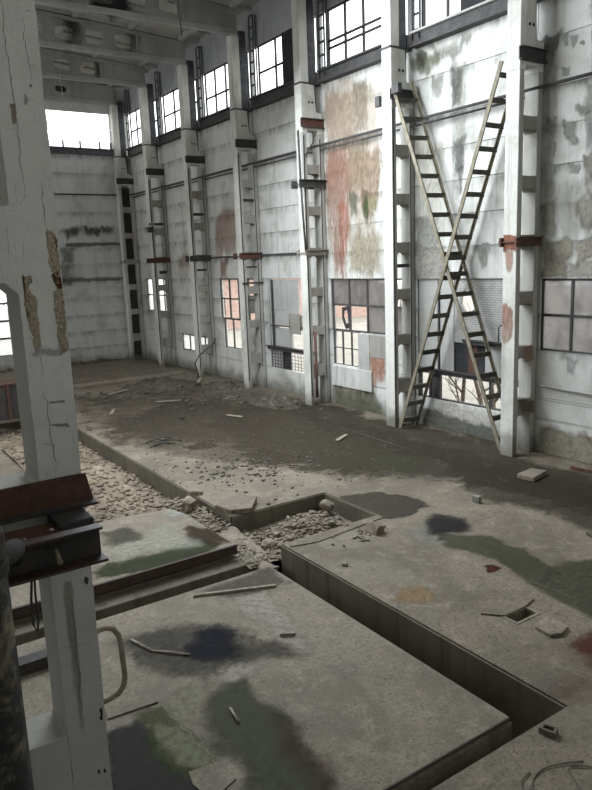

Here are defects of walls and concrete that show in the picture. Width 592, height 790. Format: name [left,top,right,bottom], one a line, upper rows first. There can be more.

damp [412,50,442,96]
crack [0,2,46,265]
damp [451,65,465,168]
damp [575,85,592,230]
corrosion [351,232,379,273]
damp [415,218,449,280]
corrosion [503,235,516,271]
peeling [541,201,592,277]
spalling [22,275,42,351]
spalling [46,230,69,354]
corrosion [370,357,385,385]
crack [61,579,85,734]